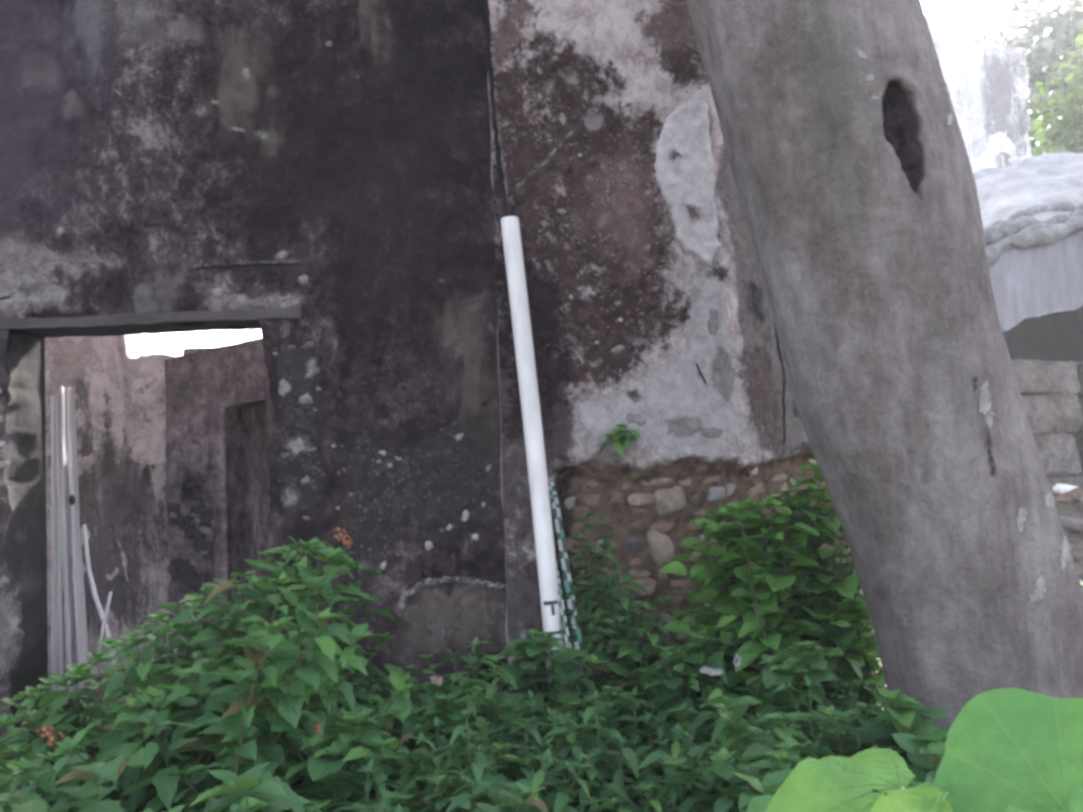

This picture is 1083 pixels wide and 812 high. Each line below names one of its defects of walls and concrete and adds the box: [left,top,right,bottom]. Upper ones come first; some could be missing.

spalling [0,231,130,318]
water stain [112,0,692,659]
peeling [654,85,729,281]
crack [776,331,786,455]
water stain [47,379,169,647]
peeling [0,572,25,687]